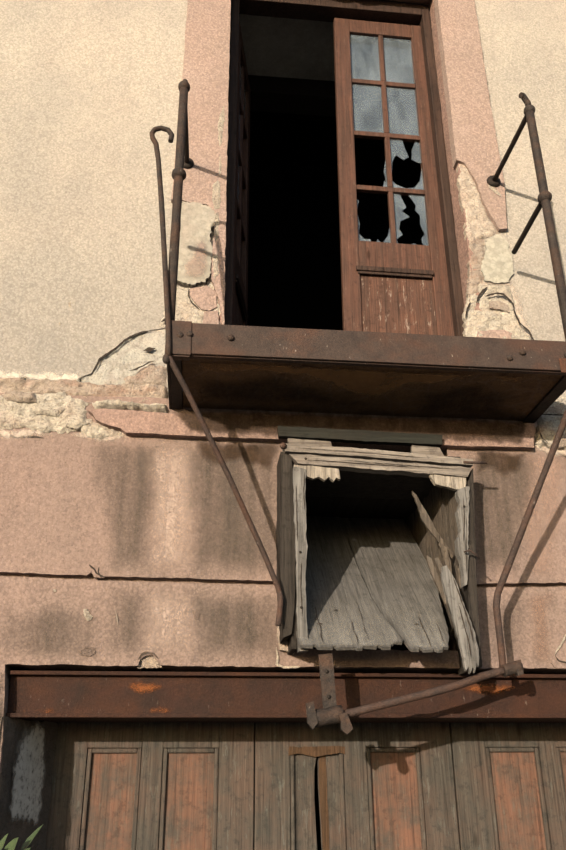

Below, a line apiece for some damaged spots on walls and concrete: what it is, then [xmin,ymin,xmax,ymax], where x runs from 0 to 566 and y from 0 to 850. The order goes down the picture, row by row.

peeling [175,106,225,324]
spalling [456,164,534,340]
spalling [0,311,168,440]
spalling [534,396,566,454]
damp [157,455,180,556]
damp [201,443,274,557]
corrosion [132,684,158,692]
corrosion [471,684,508,693]
peeling [11,724,44,823]